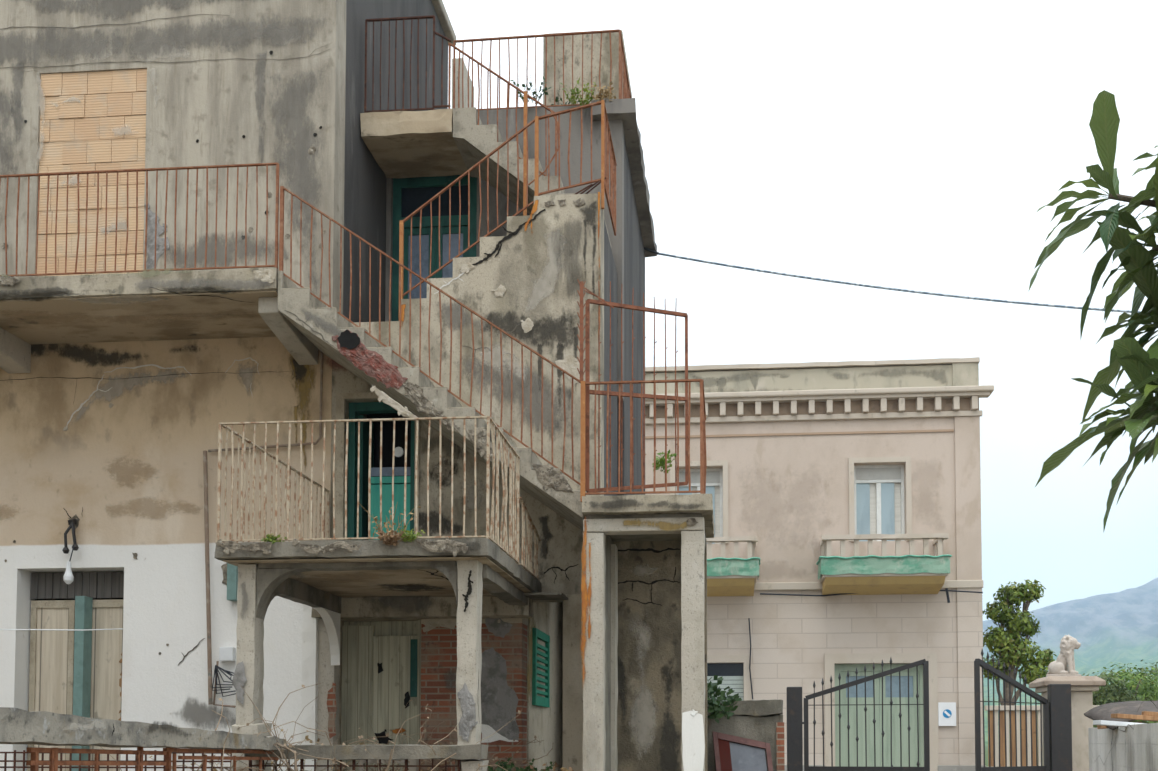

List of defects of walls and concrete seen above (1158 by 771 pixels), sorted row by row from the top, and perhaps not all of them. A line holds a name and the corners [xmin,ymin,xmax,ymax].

water stain [37,0,189,19]
water stain [0,19,320,234]
spalling [544,198,586,207]
spalling [144,203,170,270]
spalling [520,318,534,333]
water stain [30,344,139,367]
spalling [332,329,496,462]
crack [422,570,473,612]
crack [618,548,680,606]
flaking render [446,647,519,743]
water stain [618,657,680,771]